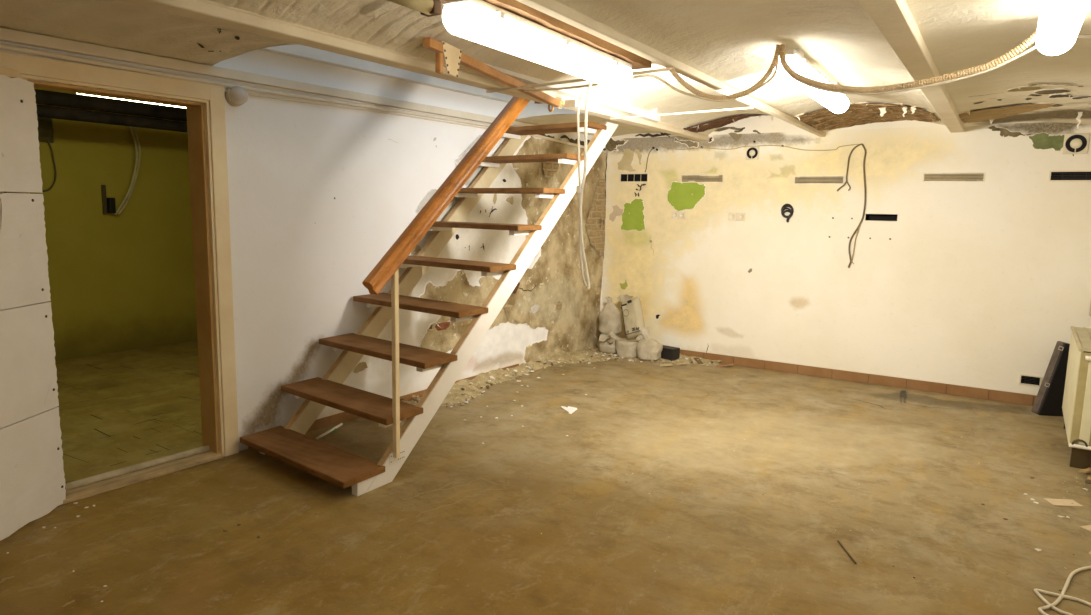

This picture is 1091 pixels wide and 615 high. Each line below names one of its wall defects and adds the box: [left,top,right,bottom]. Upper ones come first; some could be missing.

leakage [237,327,331,451]
leakage [343,355,409,397]
leakage [382,186,470,293]
peeling [415,188,438,214]
flaking render [419,315,473,353]
flaking render [419,269,500,306]
leakage [408,150,527,298]
flaking render [493,134,584,239]
flaking render [444,179,722,408]
flaking render [600,137,642,172]
peeling [674,114,771,148]
leakage [456,102,1091,381]